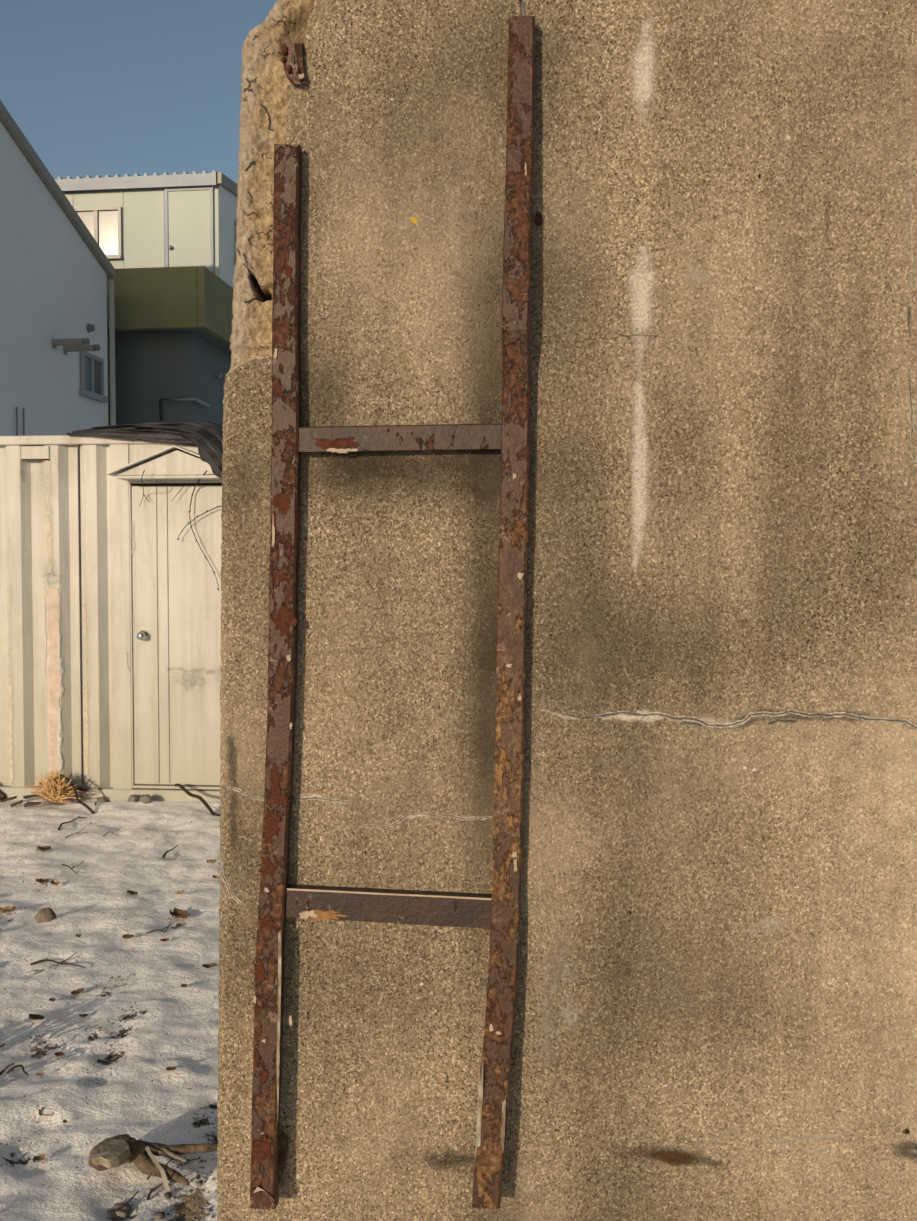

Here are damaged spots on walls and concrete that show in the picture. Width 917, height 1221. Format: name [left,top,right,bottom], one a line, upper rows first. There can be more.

water stain [632,22,655,122]
spalling [225,0,314,375]
water stain [629,246,654,571]
crack [536,709,917,730]
corrosion [655,1152,715,1164]
water stain [899,1143,917,1158]